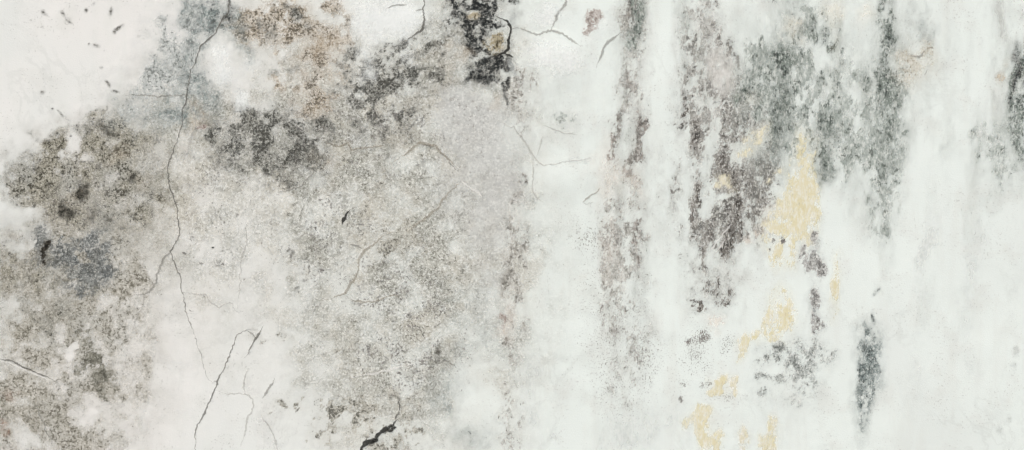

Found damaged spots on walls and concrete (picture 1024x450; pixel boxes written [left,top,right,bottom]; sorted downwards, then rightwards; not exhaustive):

crack [167,0,261,445]
water stain [0,0,537,450]
crack [360,398,400,450]
water stain [560,0,735,426]
water stain [670,0,909,320]
water stain [755,289,835,403]
water stain [857,314,882,431]
water stain [971,48,1024,183]